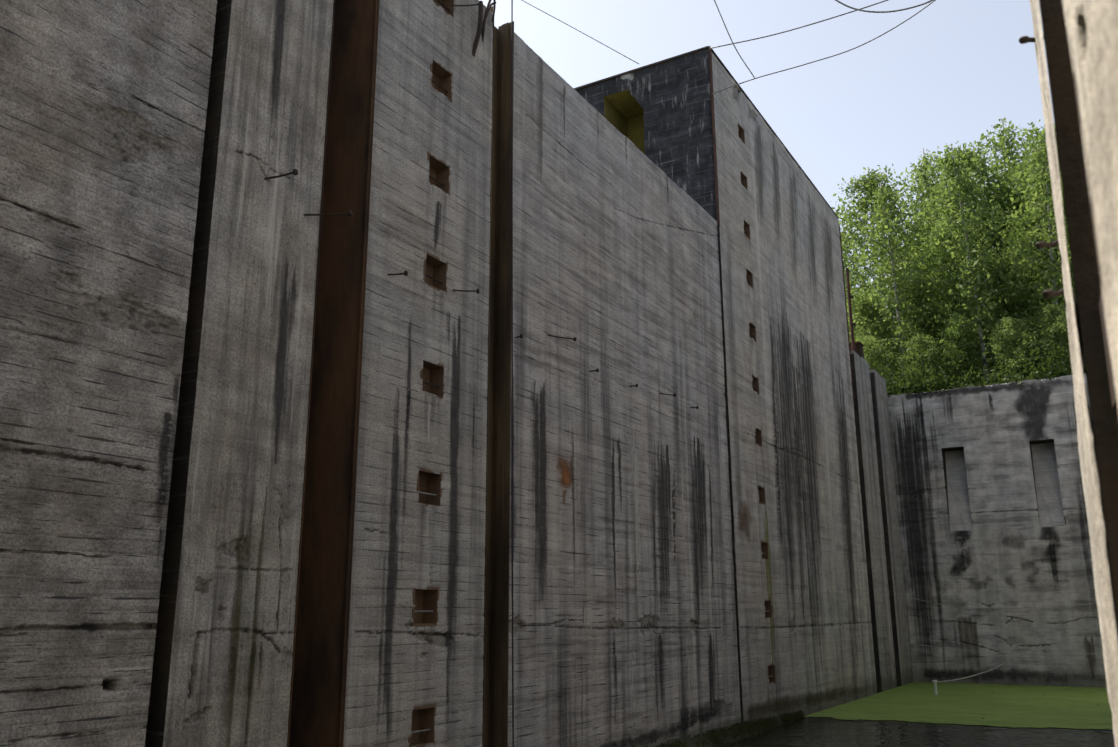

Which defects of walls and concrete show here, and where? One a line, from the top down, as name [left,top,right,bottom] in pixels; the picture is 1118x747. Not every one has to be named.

crack [0,196,52,218]
crack [0,438,150,473]
damp [533,384,547,594]
corrosion [559,459,573,504]
damp [892,381,1076,681]
crack [199,567,293,657]
crack [929,603,1099,649]